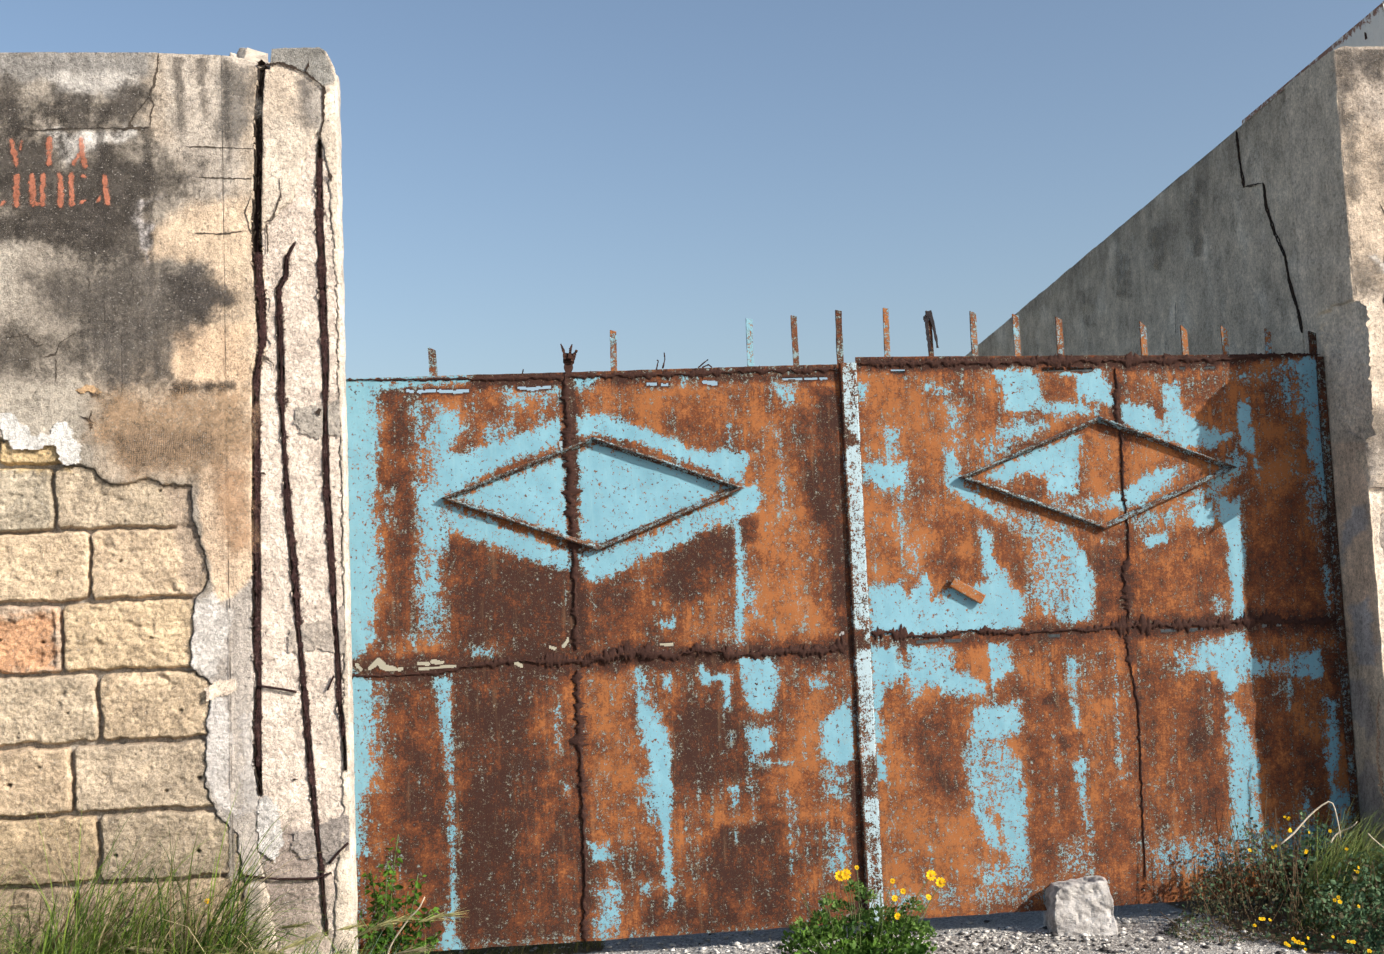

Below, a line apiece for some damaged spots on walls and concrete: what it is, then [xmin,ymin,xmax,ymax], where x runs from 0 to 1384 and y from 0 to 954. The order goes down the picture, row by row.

spalling [75,384,102,397]
damp [0,76,236,394]
flaking render [0,412,247,954]
crack [186,59,347,935]
spalling [253,135,349,954]
crack [1235,131,1303,333]